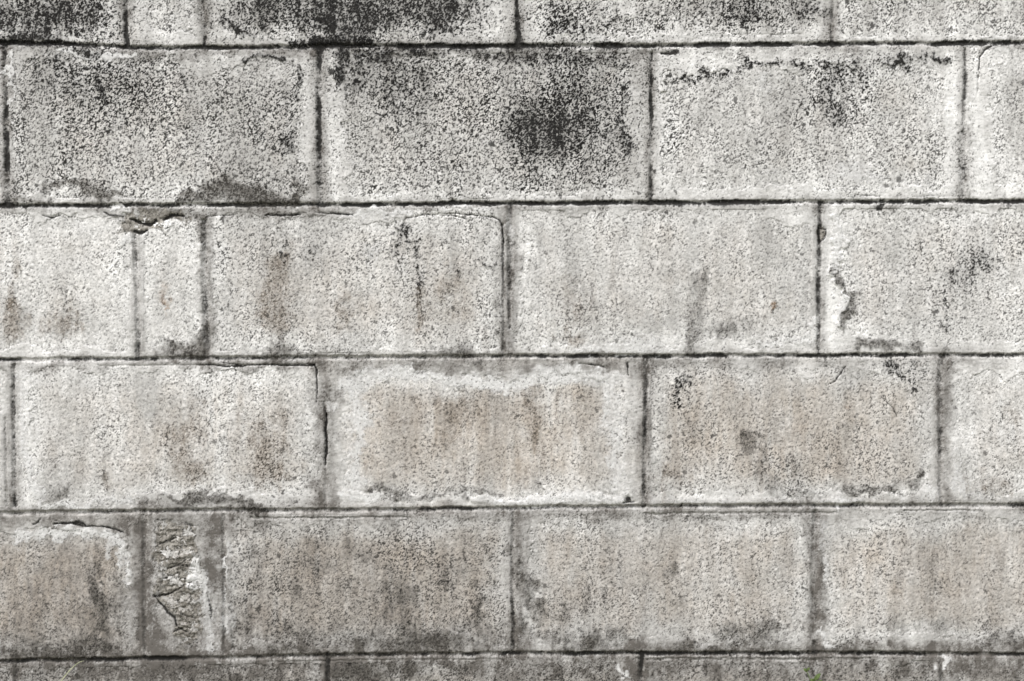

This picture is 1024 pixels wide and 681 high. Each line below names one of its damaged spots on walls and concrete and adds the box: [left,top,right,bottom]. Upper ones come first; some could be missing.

mould [699,0,765,25]
mould [782,0,830,23]
mould [219,0,636,171]
spalling [117,207,192,236]
crack [32,520,123,532]